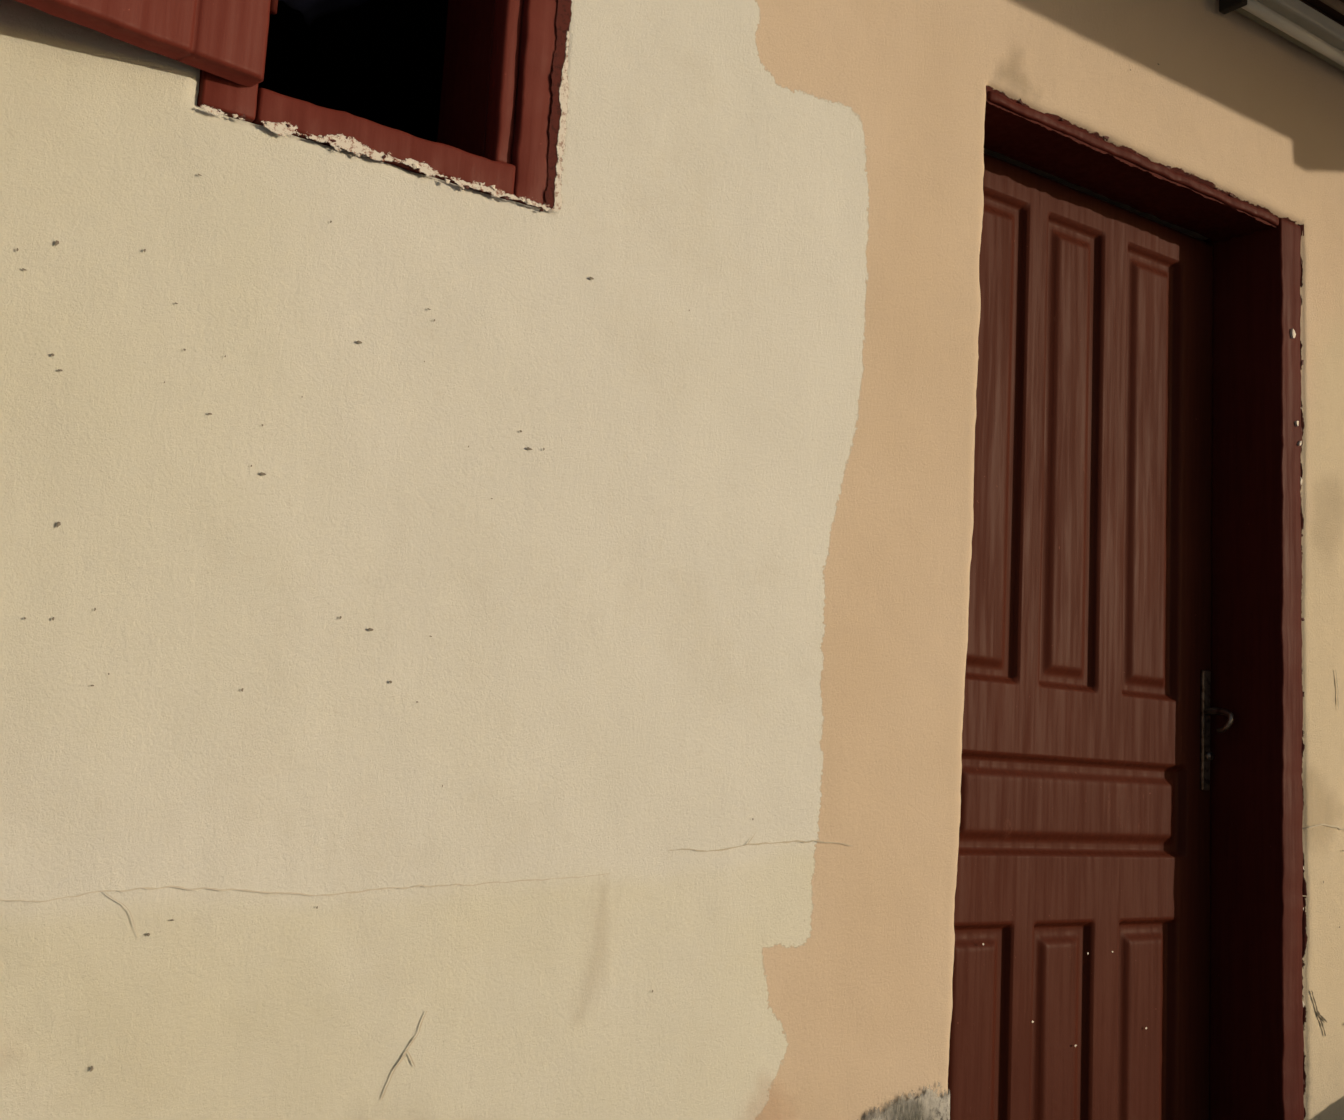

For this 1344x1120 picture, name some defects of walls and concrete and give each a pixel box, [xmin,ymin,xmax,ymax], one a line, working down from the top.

peeling [200,0,572,212]
crack [670,834,852,852]
crack [0,873,610,939]
spalling [862,1083,950,1120]